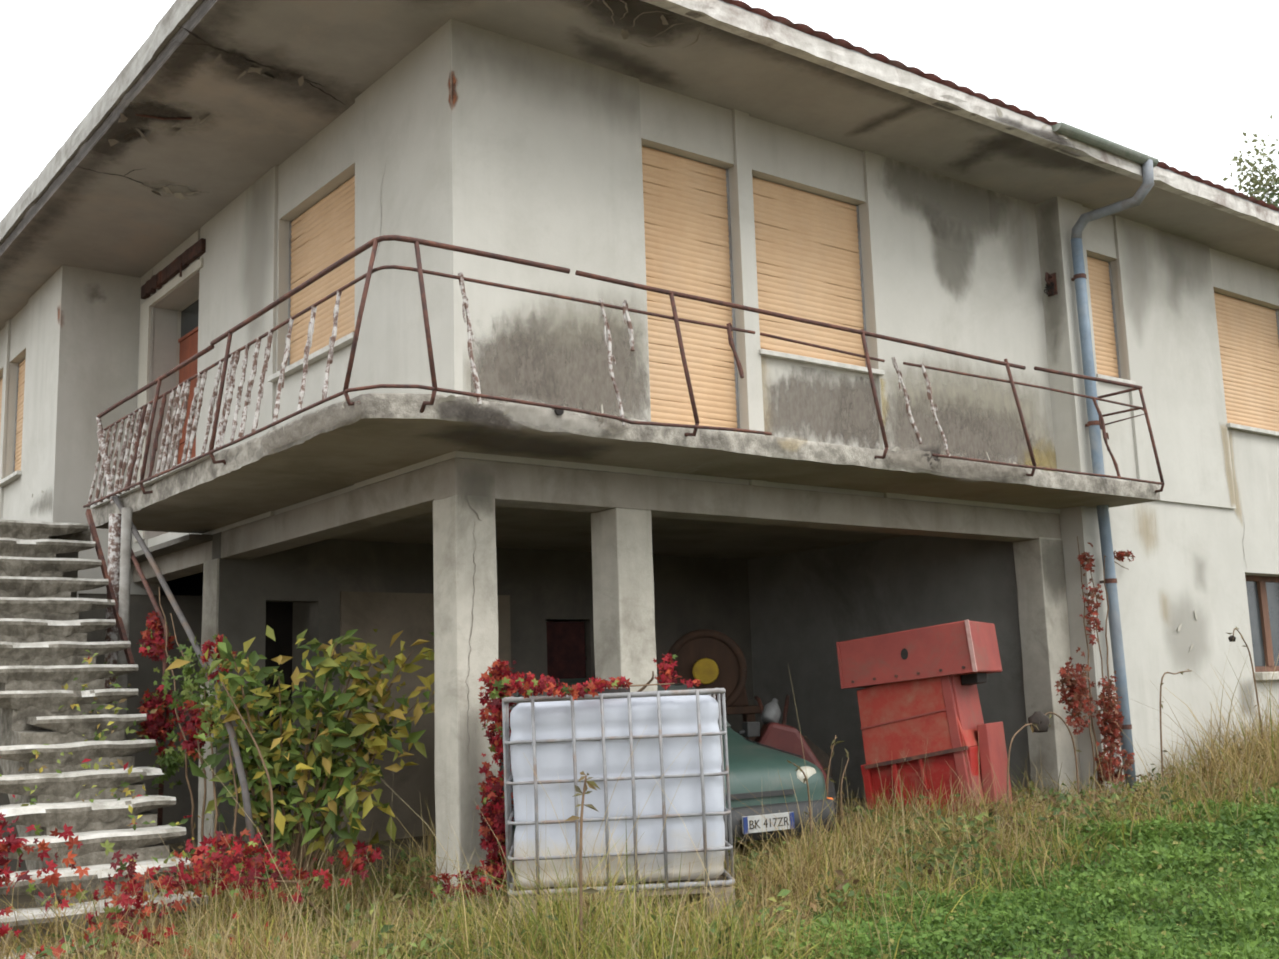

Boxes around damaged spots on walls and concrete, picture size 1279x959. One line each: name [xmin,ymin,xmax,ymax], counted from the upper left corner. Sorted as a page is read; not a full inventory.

crack [172,26,345,105]
spalling [108,100,211,147]
water stain [889,164,1000,289]
water stain [471,315,648,420]
water stain [766,371,1049,471]
crack [466,522,476,749]